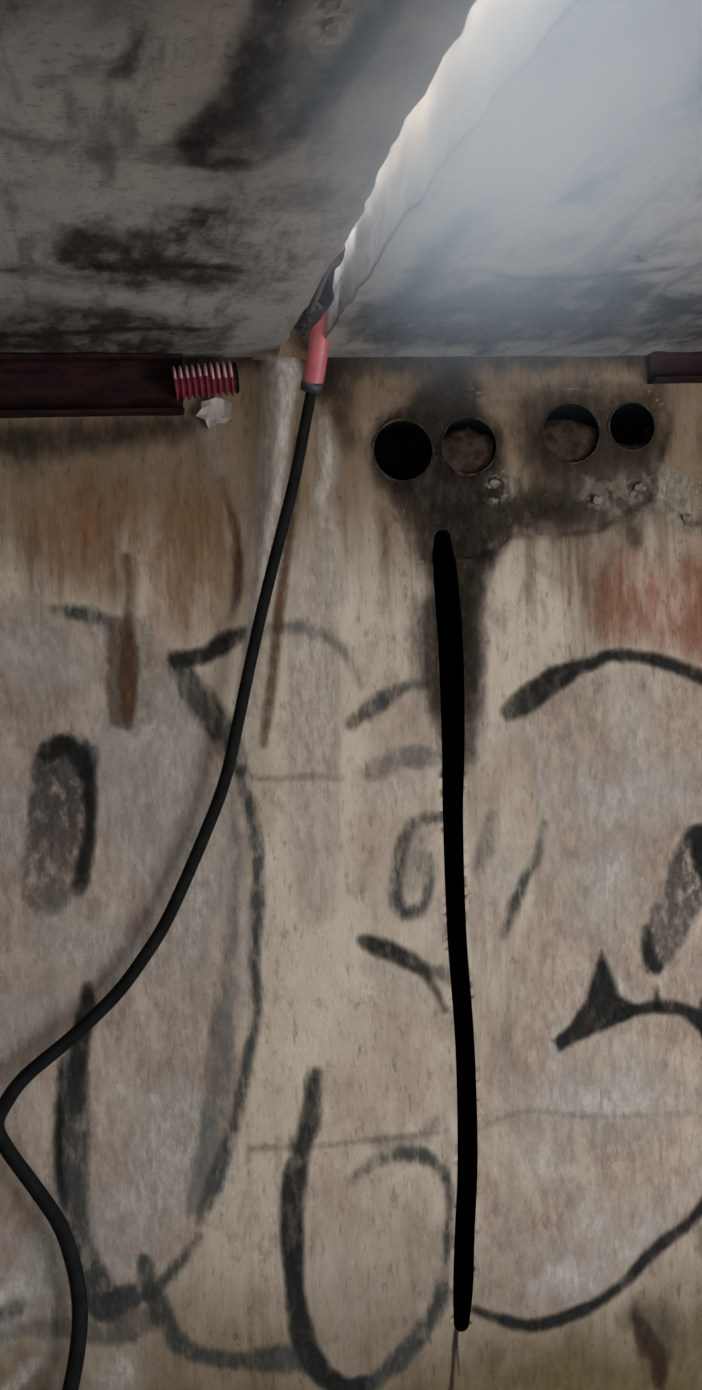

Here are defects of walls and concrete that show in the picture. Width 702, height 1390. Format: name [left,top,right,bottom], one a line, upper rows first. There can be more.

water stain [316,210,702,772]